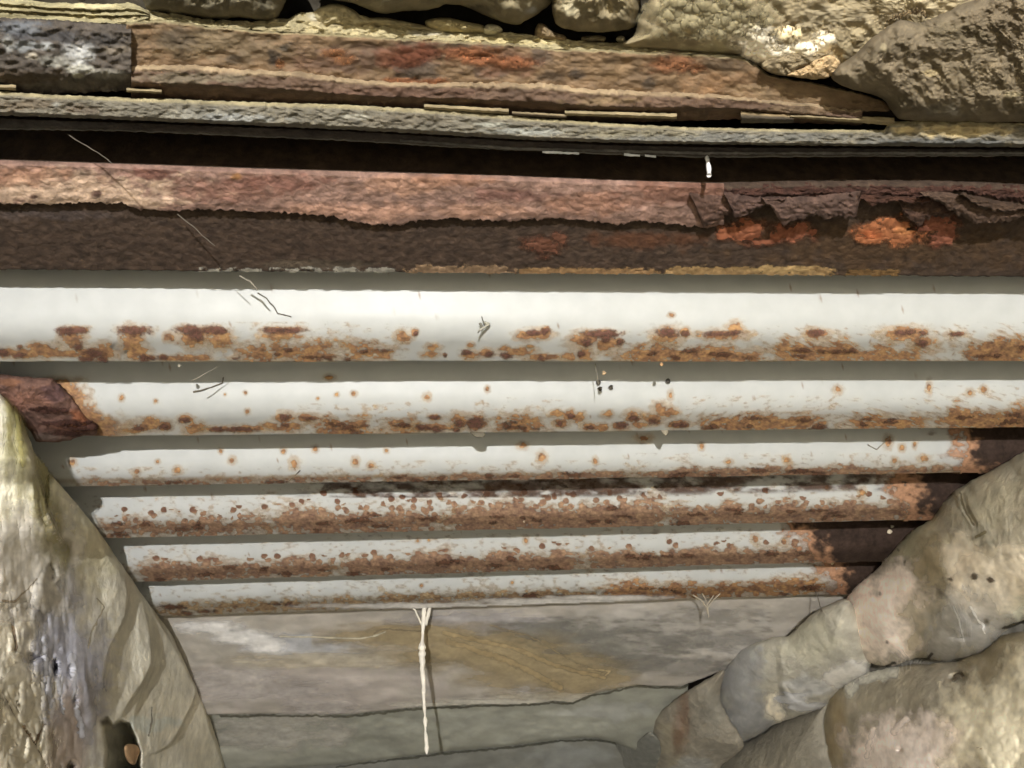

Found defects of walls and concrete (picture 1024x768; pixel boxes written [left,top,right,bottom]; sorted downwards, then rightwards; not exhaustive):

corrosion [385,42,535,84]
corrosion [0,160,1024,277]
corrosion [0,324,419,363]
corrosion [421,344,447,357]
corrosion [461,313,1024,362]
corrosion [0,374,829,451]
corrosion [83,386,1024,616]
crack [220,625,689,718]